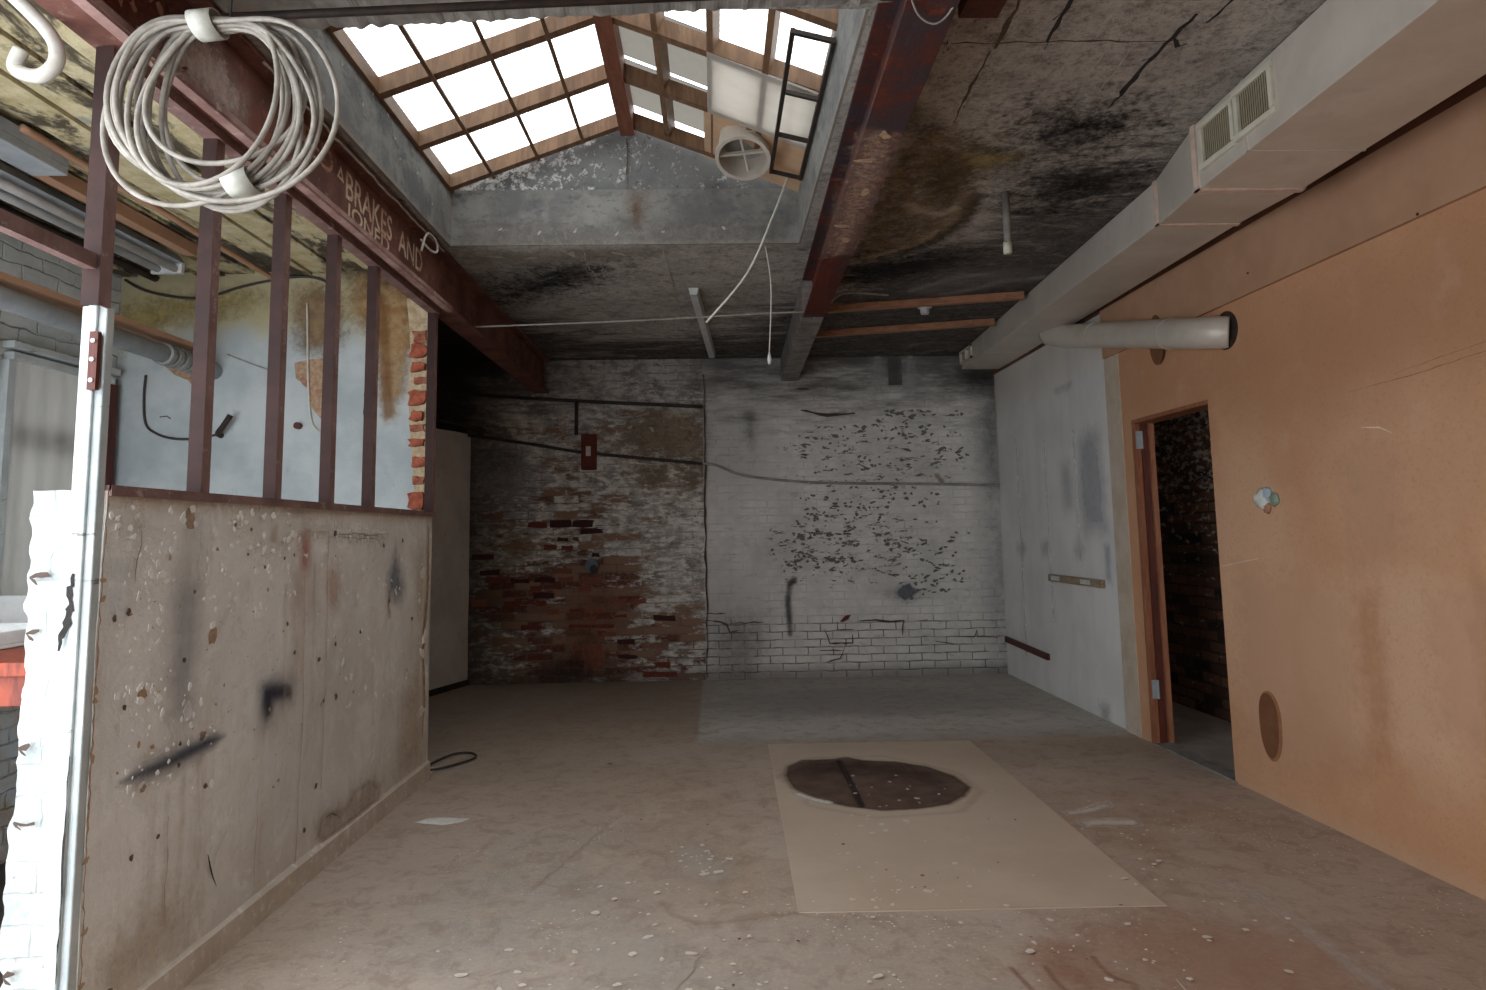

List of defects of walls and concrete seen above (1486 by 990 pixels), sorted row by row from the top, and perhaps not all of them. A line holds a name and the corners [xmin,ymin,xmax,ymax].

crack [942,0,1234,123]
leakage [839,94,1156,288]
spalling [470,520,678,677]
peeling [770,409,970,600]